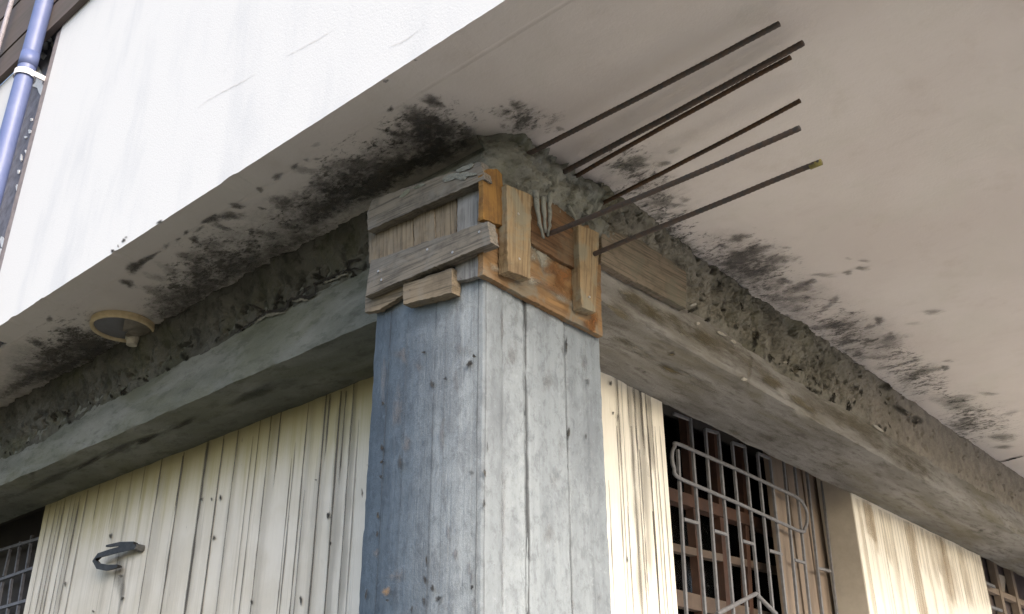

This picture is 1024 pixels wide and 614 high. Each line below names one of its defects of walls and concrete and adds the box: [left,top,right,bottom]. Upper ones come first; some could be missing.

peeling [32,38,54,95]
mould [282,97,476,233]
mould [610,150,694,239]
mould [28,318,109,380]
mould [121,255,153,287]
spalling [0,211,370,459]
mould [153,204,284,315]
spalling [545,99,1024,515]
damp [699,236,882,364]
mould [889,352,946,396]